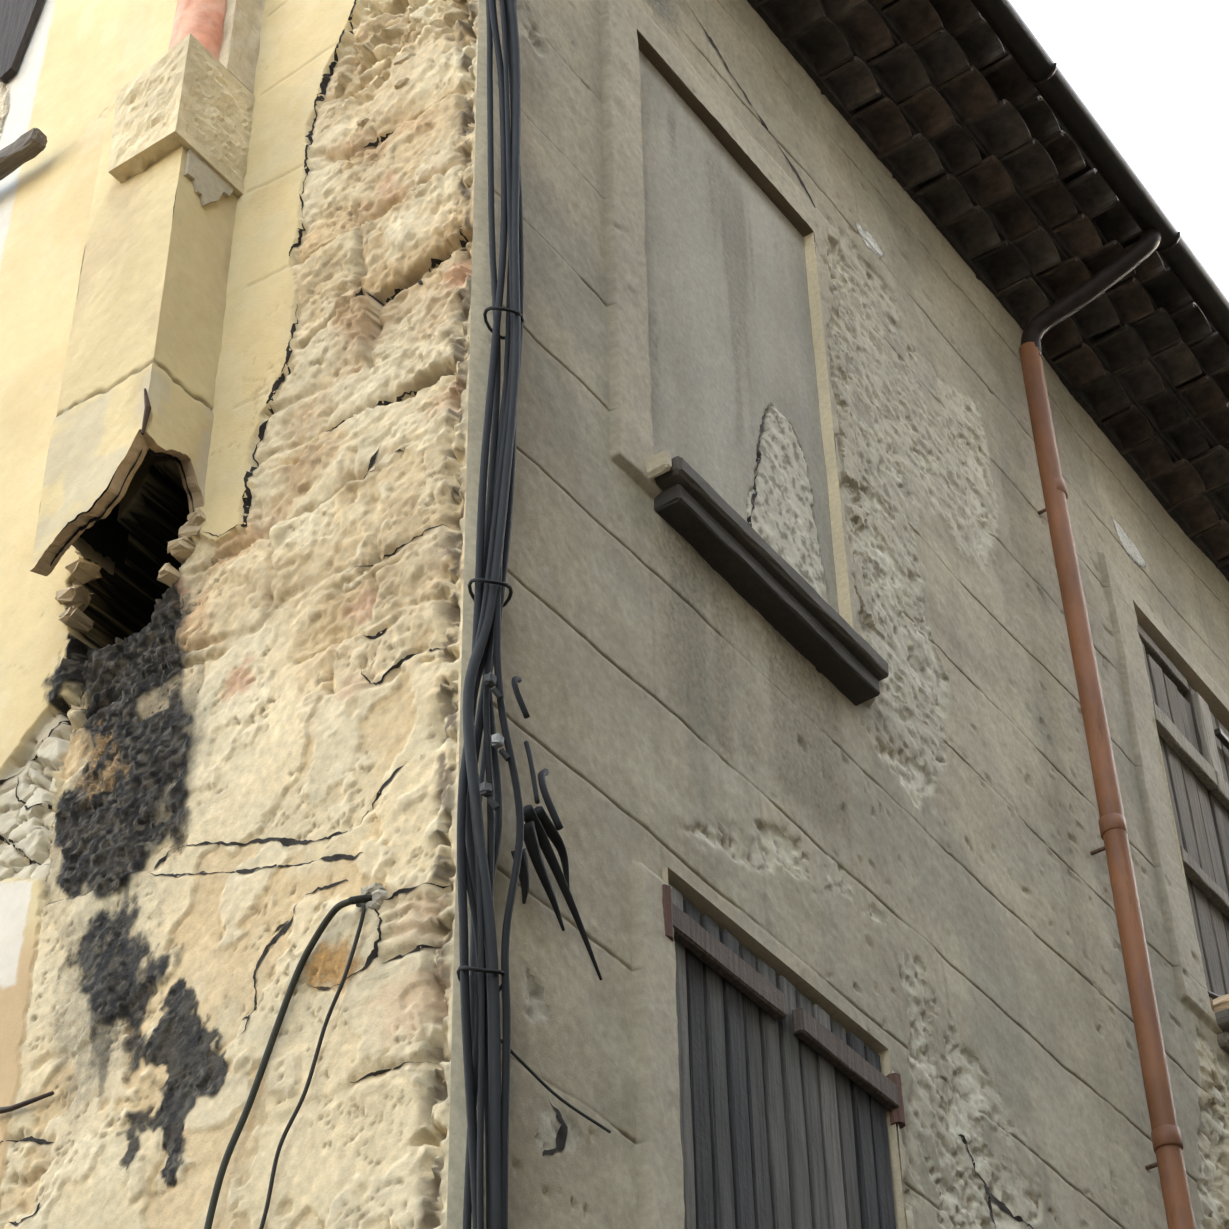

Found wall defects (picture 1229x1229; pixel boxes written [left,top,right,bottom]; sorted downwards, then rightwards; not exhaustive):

crack [289,0,383,258]
crack [363,132,393,148]
spalling [0,0,479,1229]
crack [203,302,300,537]
spalling [746,405,832,607]
spalling [826,223,999,809]
crack [0,704,81,810]
water stain [67,889,177,1081]
crack [150,765,404,1034]
crack [312,882,452,991]
spalling [899,949,1045,1229]
spalling [1195,1028,1229,1229]